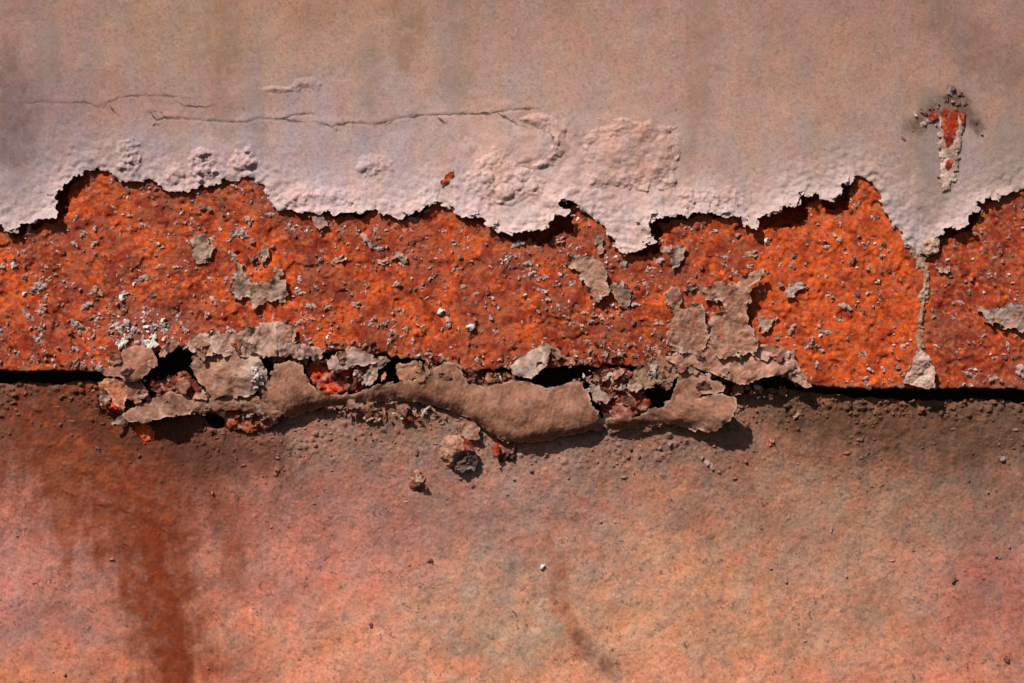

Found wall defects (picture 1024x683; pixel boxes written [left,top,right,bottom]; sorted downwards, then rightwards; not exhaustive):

spalling [901,84,984,193]
peeling [2,185,59,233]
peeling [465,207,514,236]
peeling [534,196,571,229]
peeling [635,209,664,245]
peeling [677,174,855,230]
peeling [919,188,1011,257]
peeling [98,320,812,473]
corrosion [0,168,1024,683]